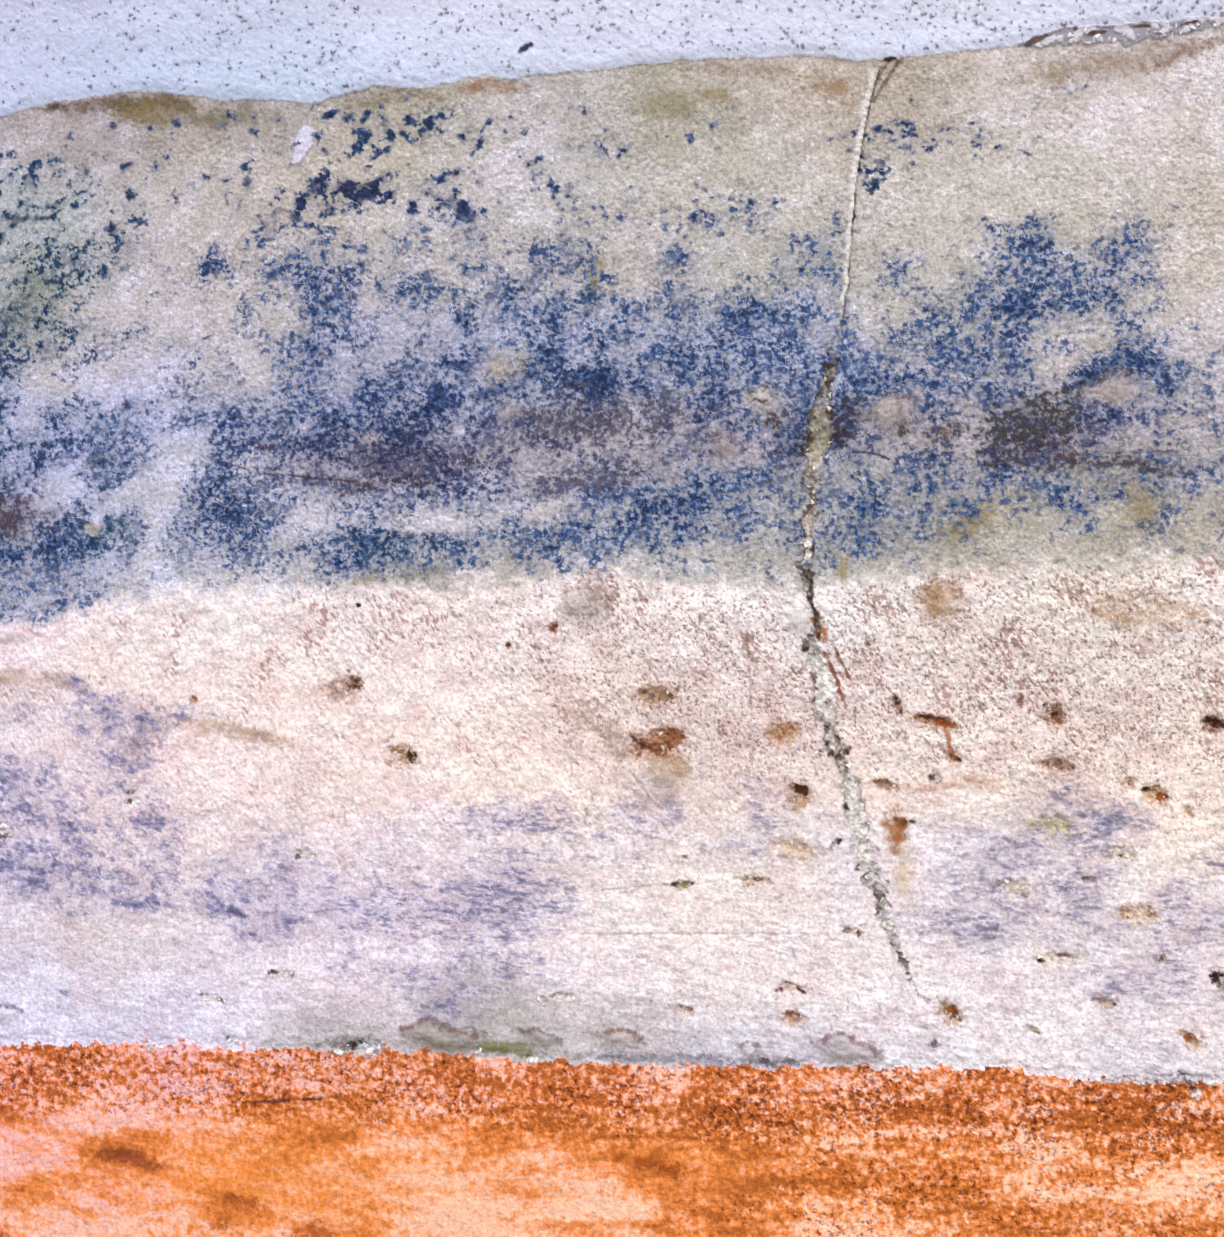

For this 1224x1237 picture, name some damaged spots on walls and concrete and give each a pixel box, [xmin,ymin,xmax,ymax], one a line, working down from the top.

peeling [1018,11,1224,48]
leakage [468,78,516,93]
crack [840,57,897,315]
leakage [0,90,1224,622]
leakage [1092,592,1210,631]
crack [764,356,906,960]
corrosion [944,727,954,756]
corrosion [97,1148,159,1170]
corrosion [614,1153,685,1180]
corrosion [217,1193,265,1211]
corrosion [282,1220,332,1237]